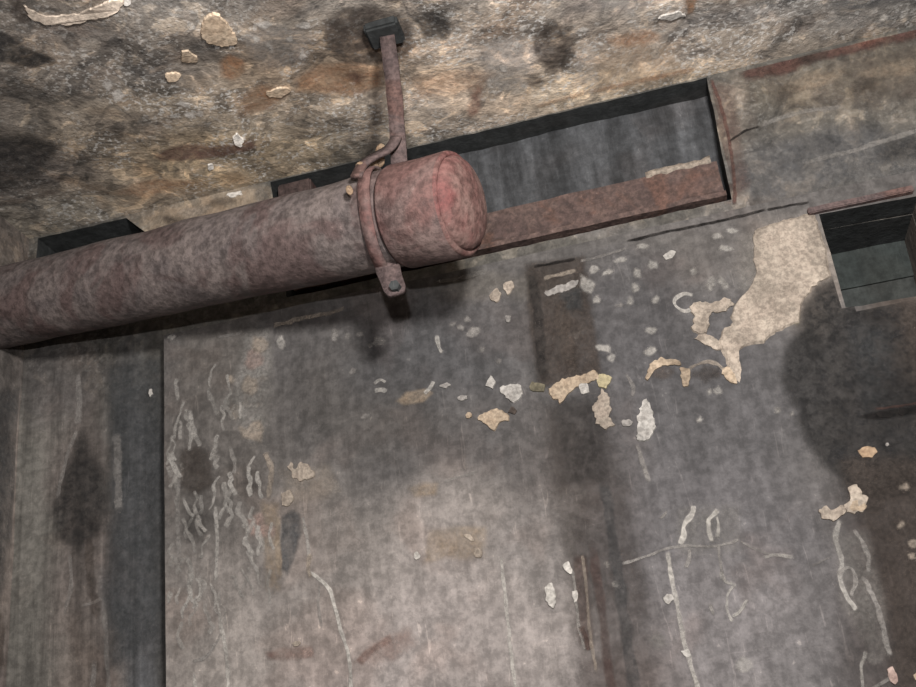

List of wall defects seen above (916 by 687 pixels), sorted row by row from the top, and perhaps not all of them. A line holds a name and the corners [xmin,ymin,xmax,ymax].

spalling [581,258,626,302]
peeling [645,214,831,387]
peeling [466,370,657,480]
peeling [818,484,869,522]
peeling [887,666,898,685]